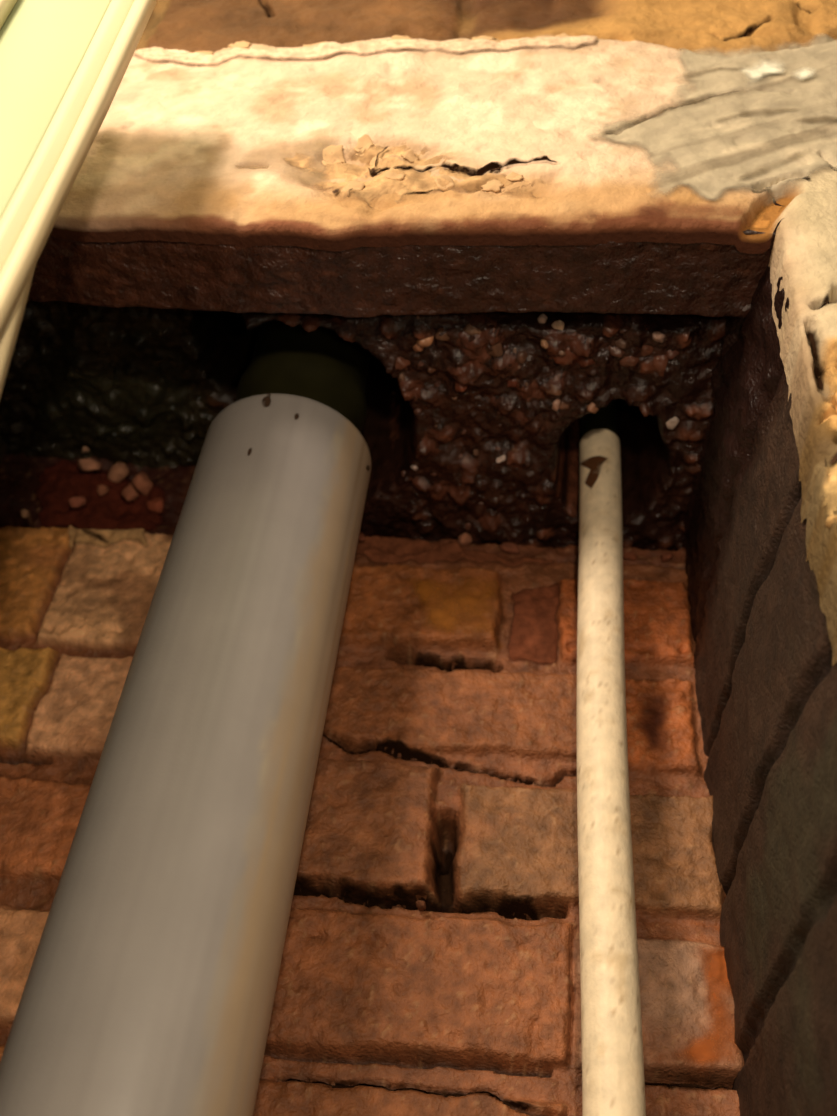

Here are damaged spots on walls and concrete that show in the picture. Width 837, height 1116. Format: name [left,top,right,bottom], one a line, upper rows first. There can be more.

crack [369,146,556,176]
flaking render [823,453,837,528]